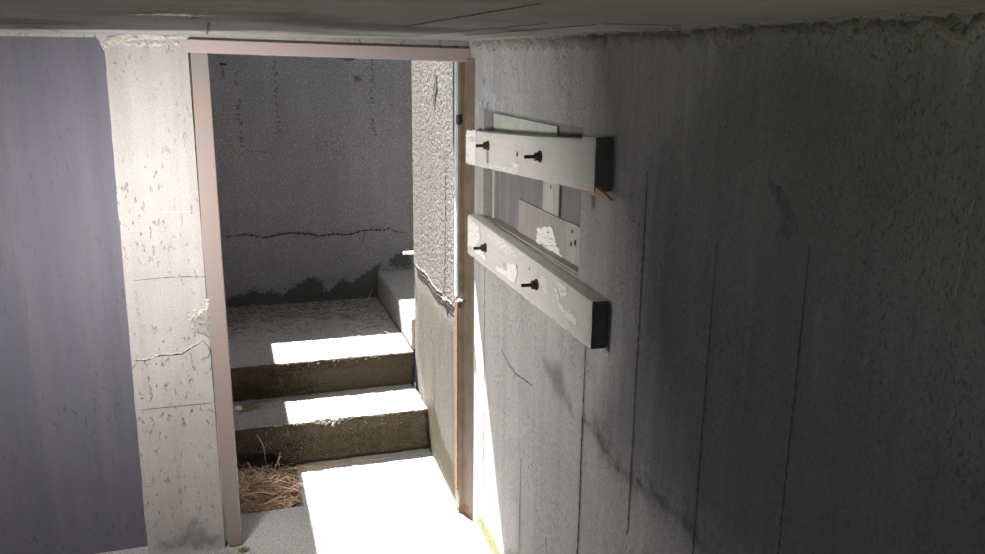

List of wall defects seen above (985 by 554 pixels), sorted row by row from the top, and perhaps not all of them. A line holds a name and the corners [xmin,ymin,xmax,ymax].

crack [223,225,408,244]
crack [415,264,452,308]
crack [134,339,210,361]